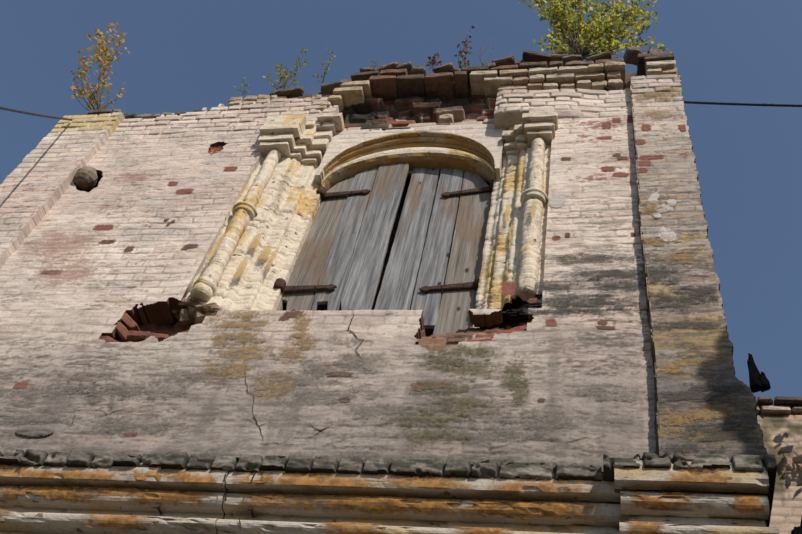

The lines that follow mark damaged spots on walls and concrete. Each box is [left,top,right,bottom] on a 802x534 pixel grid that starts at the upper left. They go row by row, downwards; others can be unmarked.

spalling [339,87,497,131]
water stain [633,88,683,119]
spalling [101,298,222,342]
crack [334,314,379,368]
spalling [417,321,532,350]
water stain [0,309,583,464]
crack [243,373,359,448]